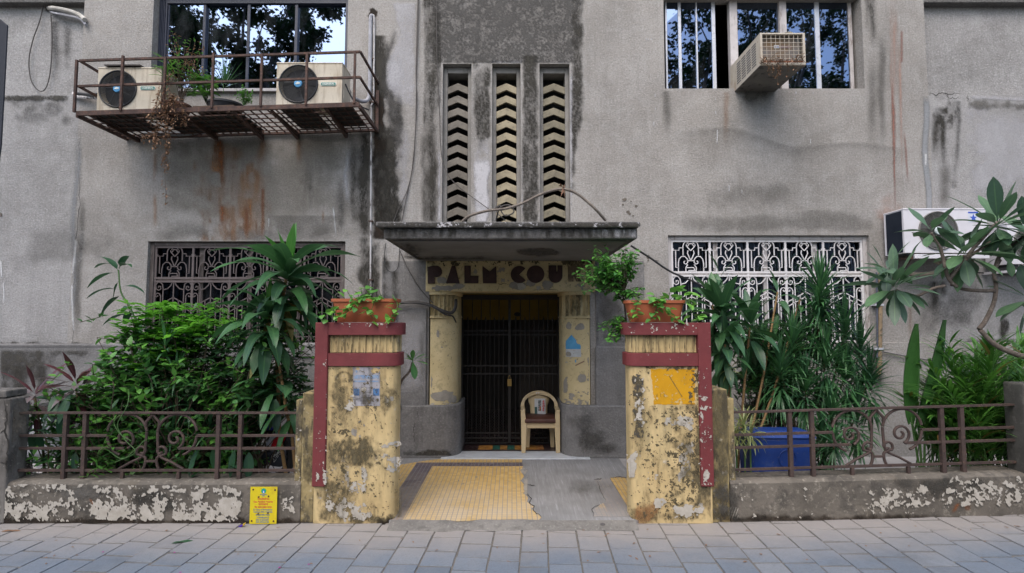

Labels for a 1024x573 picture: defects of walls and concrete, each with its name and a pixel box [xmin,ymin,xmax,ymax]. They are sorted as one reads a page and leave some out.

damp [313,0,639,299]
damp [933,96,1024,189]
peeling [344,394,365,437]
peeling [634,378,645,427]
peeling [4,484,242,522]
peeling [316,433,372,522]
peeling [626,451,658,480]
peeling [652,368,757,519]
peeling [864,474,1024,514]